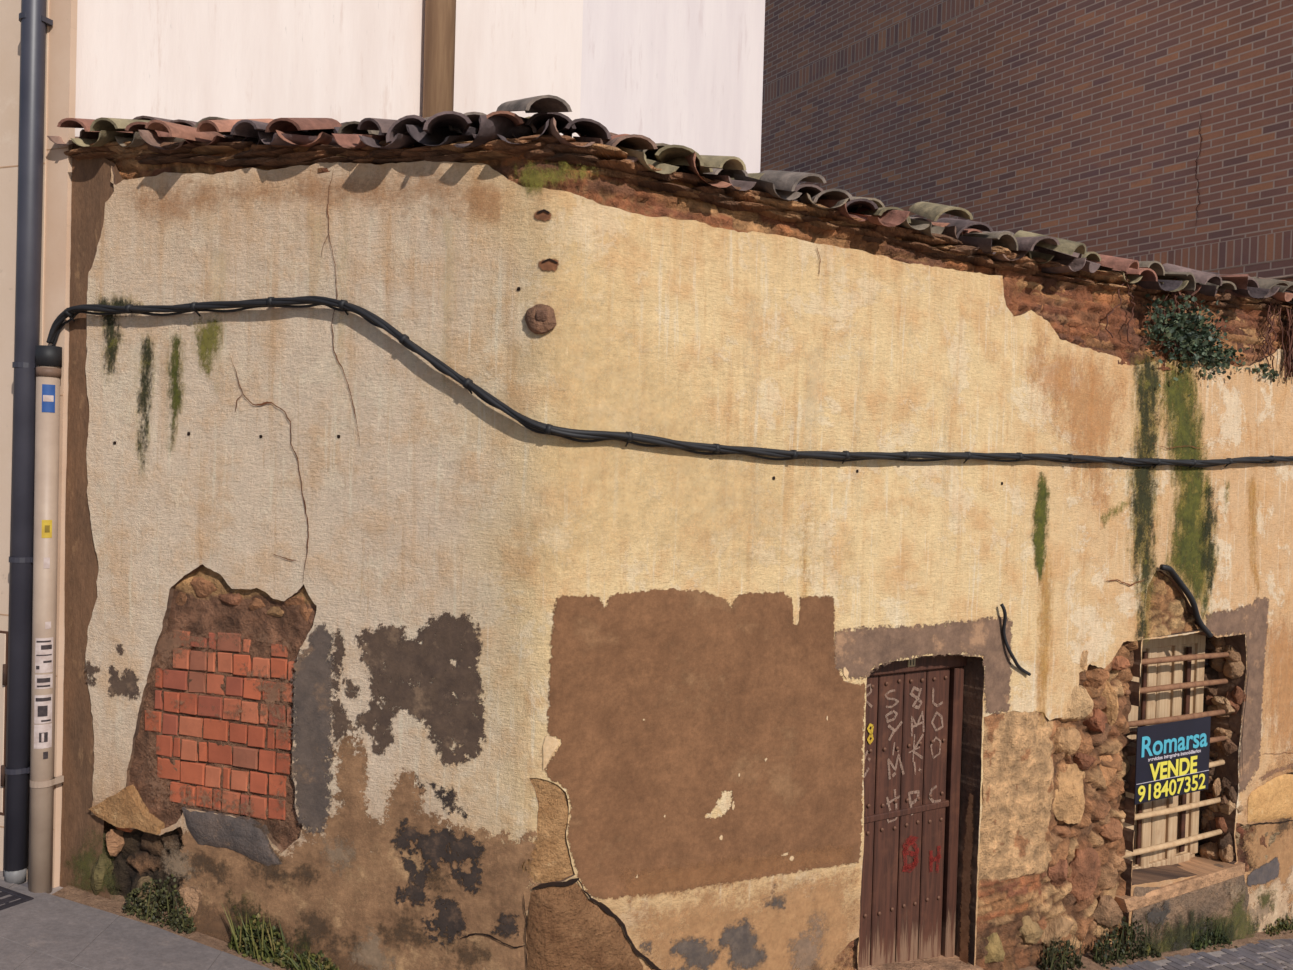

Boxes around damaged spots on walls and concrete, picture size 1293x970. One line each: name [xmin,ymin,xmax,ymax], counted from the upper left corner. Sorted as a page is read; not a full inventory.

damp [98,298,137,372]
damp [137,338,154,463]
damp [168,337,181,441]
damp [195,320,221,373]
crack [322,166,360,446]
spalling [995,268,1291,373]
crack [229,354,309,579]
damp [1101,354,1218,637]
spalling [83,566,317,922]
spalling [975,571,1200,970]
damp [246,818,356,889]
damp [164,843,491,970]